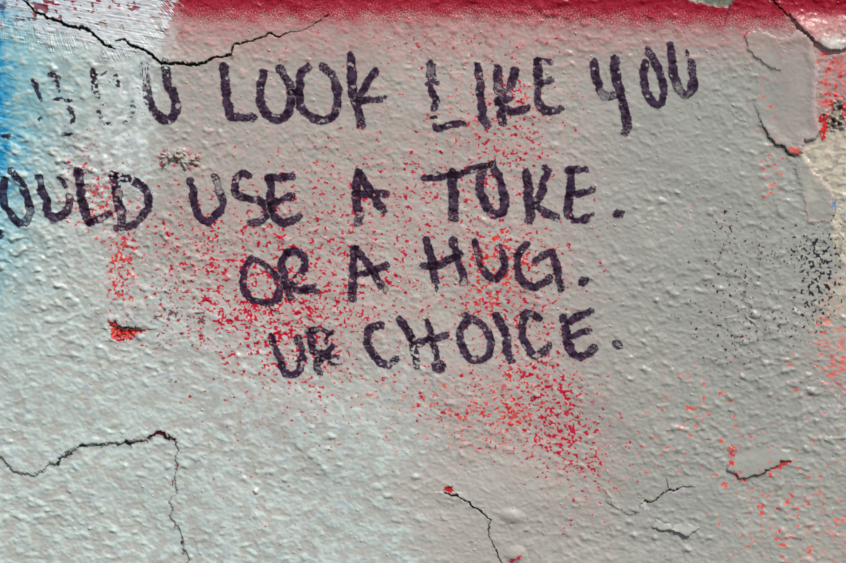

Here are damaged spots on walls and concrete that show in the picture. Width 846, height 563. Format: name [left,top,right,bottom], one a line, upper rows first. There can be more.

crack [20,0,330,69]
peeling [688,0,735,8]
peeling [741,10,846,158]
crack [168,440,190,563]
crack [458,493,504,563]
crack [604,477,693,518]
peeling [726,445,793,483]